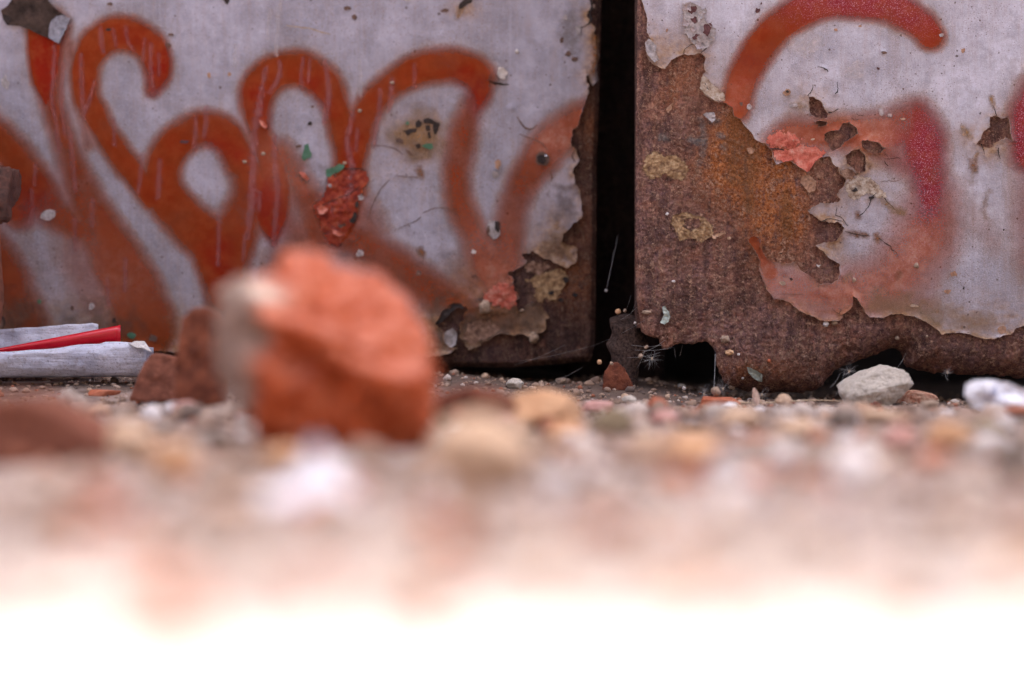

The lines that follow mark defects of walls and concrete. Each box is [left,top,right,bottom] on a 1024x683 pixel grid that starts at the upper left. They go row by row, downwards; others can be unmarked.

peeling [127,332,177,356]
peeling [432,0,601,367]
peeling [635,0,1024,393]